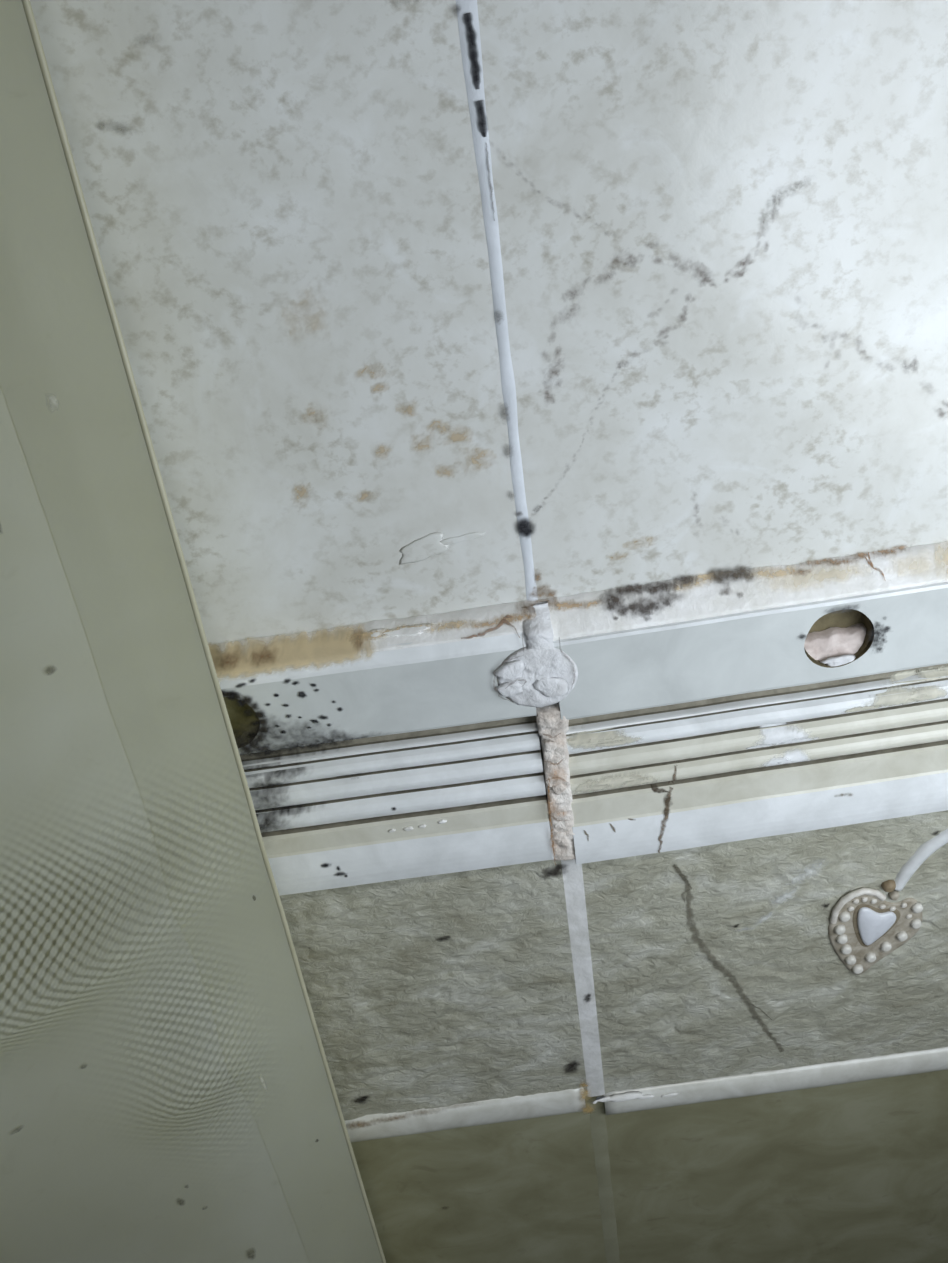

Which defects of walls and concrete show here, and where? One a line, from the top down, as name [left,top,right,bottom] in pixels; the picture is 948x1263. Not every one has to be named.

leakage [607,567,790,620]
leakage [209,621,463,832]
crack [651,758,783,1052]